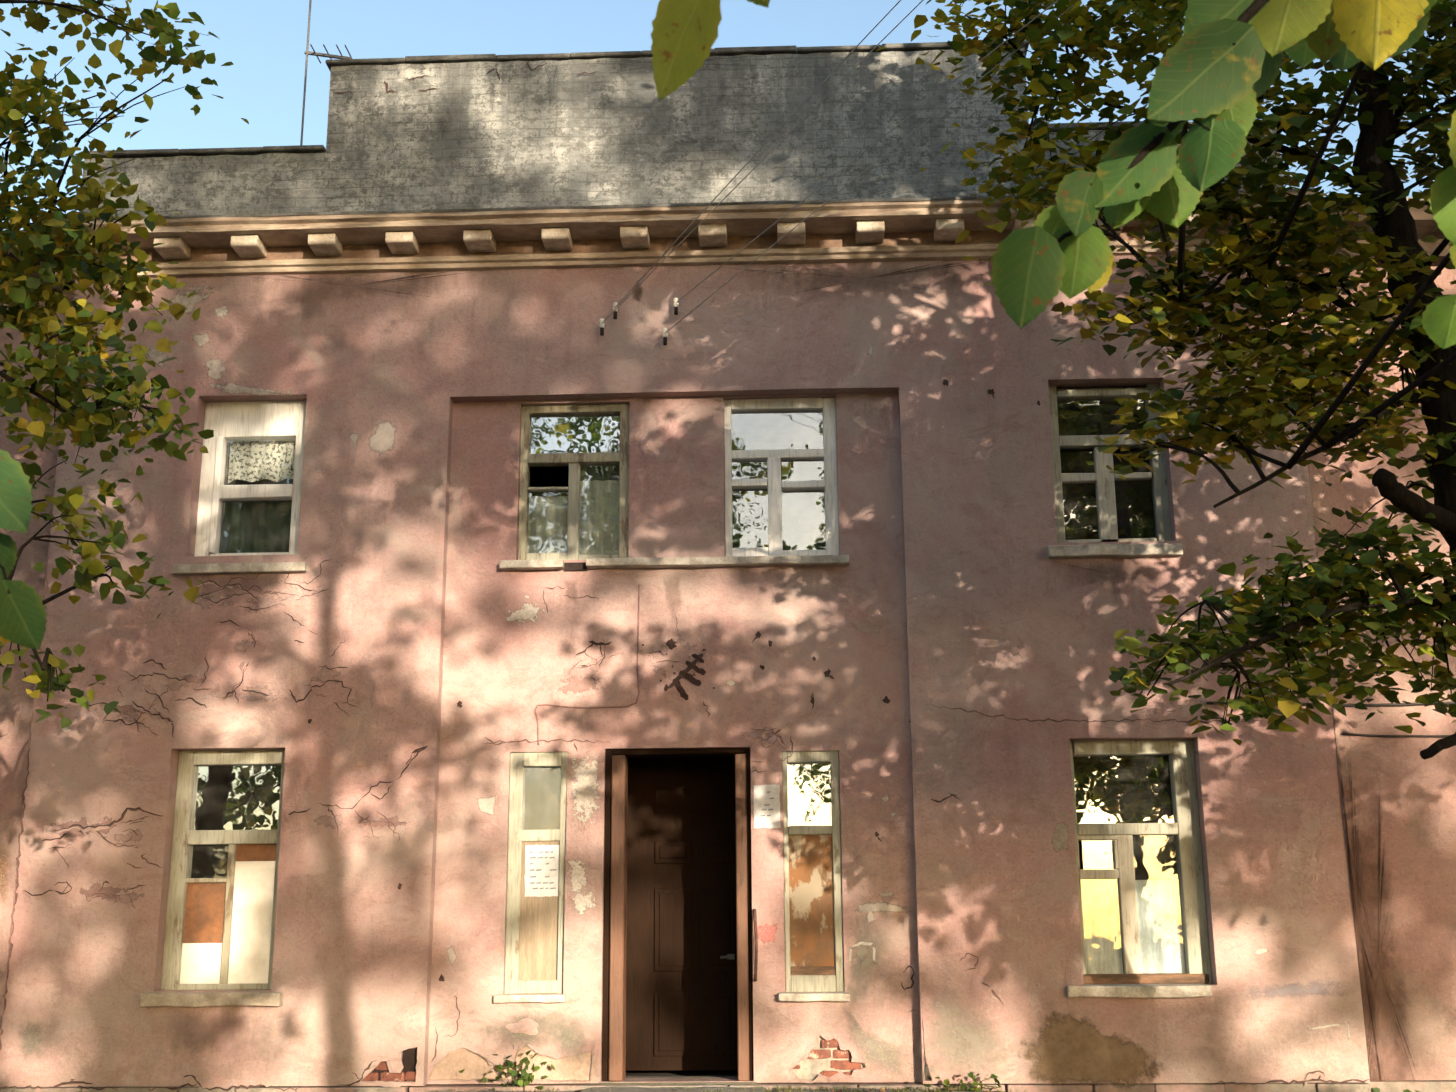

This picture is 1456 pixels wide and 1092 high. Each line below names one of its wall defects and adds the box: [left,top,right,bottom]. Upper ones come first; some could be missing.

peeling [350,422,396,454]
peeling [506,596,545,625]
crack [79,560,357,737]
crack [559,640,625,695]
peeling [642,634,736,700]
crack [288,746,428,842]
peeling [570,755,603,830]
crack [0,733,164,1050]
peeling [568,855,596,915]
crack [3,1075,295,1092]
spalling [358,1040,597,1087]
spalling [788,1030,869,1083]